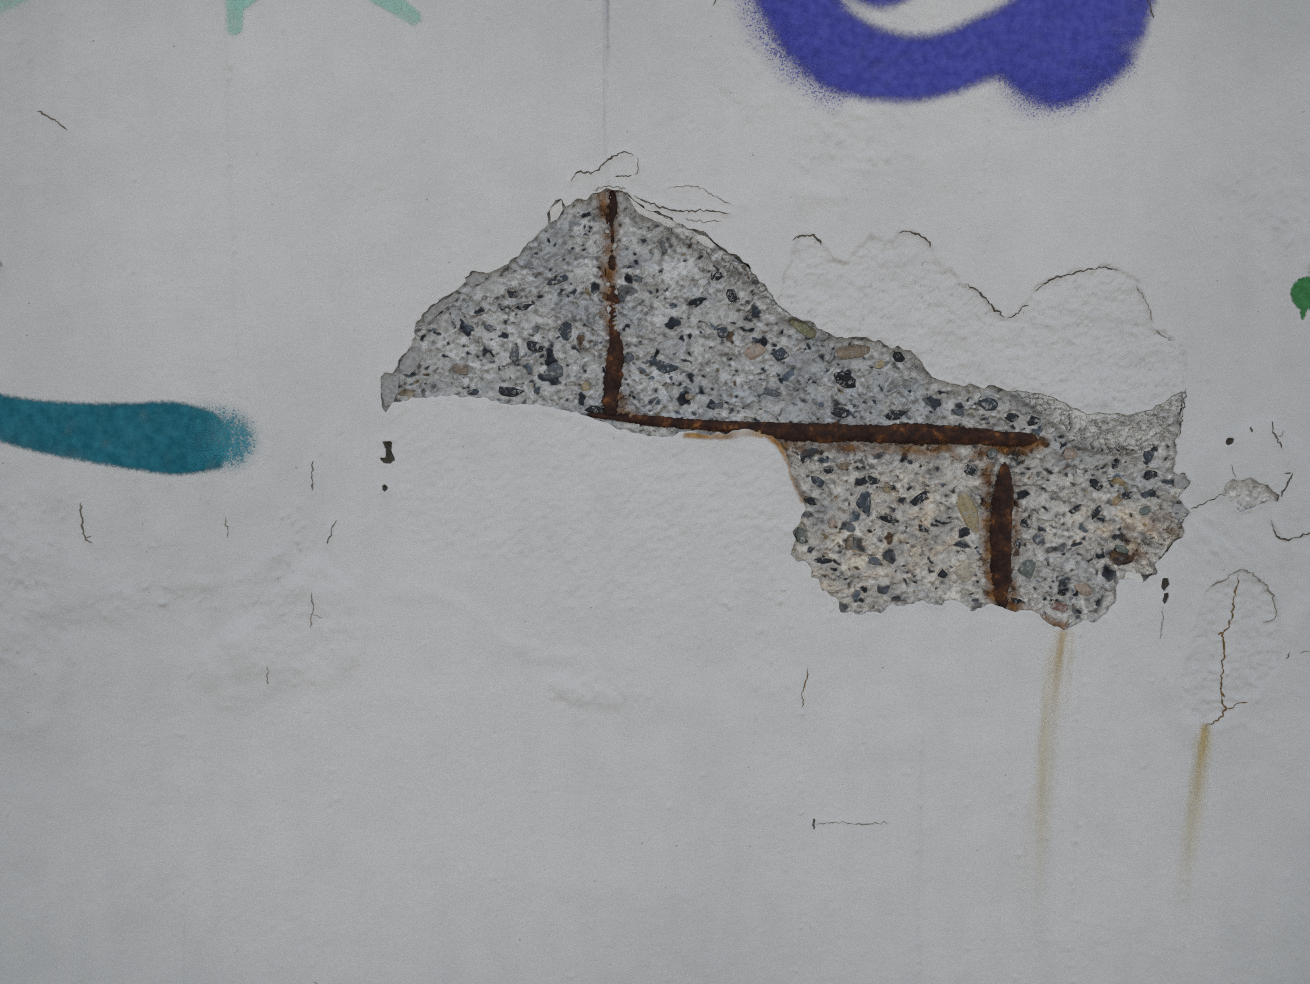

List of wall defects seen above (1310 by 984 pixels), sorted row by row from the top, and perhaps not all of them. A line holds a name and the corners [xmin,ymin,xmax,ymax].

spalling [381,189,1190,630]
rust [755,432,803,502]
rust [976,438,1047,485]
spalling [1222,478,1278,511]
crack [1250,422,1293,495]
rust [983,517,1020,612]
crack [1272,525,1310,541]
crack [1206,569,1277,726]